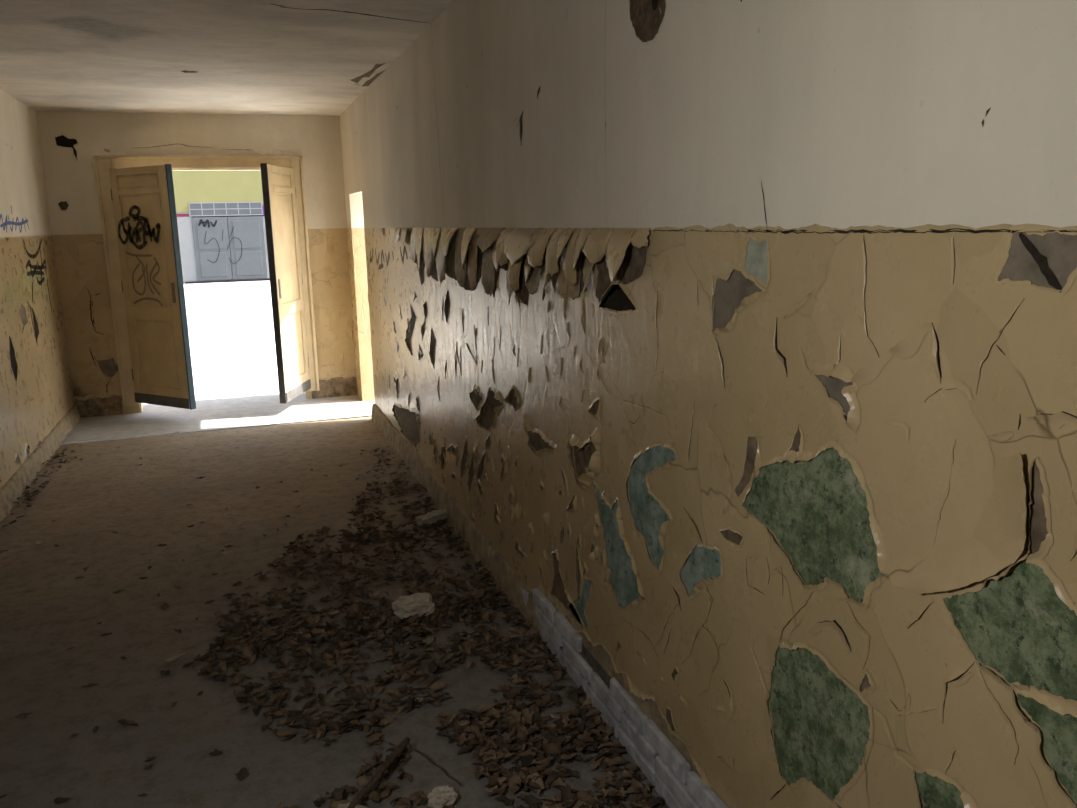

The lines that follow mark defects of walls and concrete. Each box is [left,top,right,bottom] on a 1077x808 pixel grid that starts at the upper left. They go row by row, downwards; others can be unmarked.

crack [270,3,426,23]
spalling [629,0,667,45]
peeling [711,234,771,336]
crack [652,181,1077,402]
peeling [995,227,1077,296]
peeling [382,228,680,612]
crack [988,411,1077,443]
peeling [734,422,888,609]
crack [932,439,956,550]
peeling [939,456,1077,808]
peeling [766,640,876,807]
peeling [911,764,978,808]